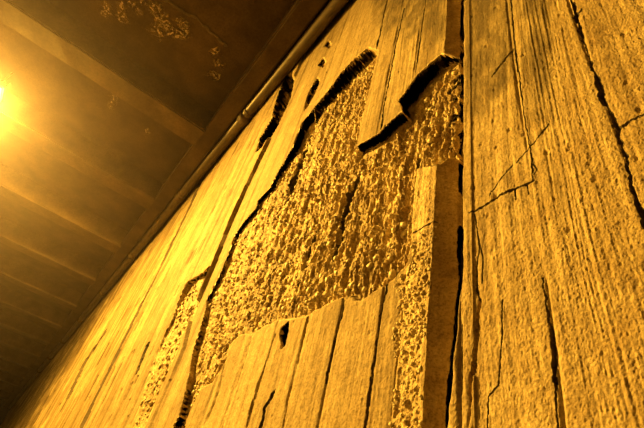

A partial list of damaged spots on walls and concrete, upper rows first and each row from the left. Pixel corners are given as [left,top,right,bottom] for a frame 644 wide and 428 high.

spalling [133,47,464,428]
crack [462,0,550,428]
crack [541,278,560,428]
crack [570,0,644,229]